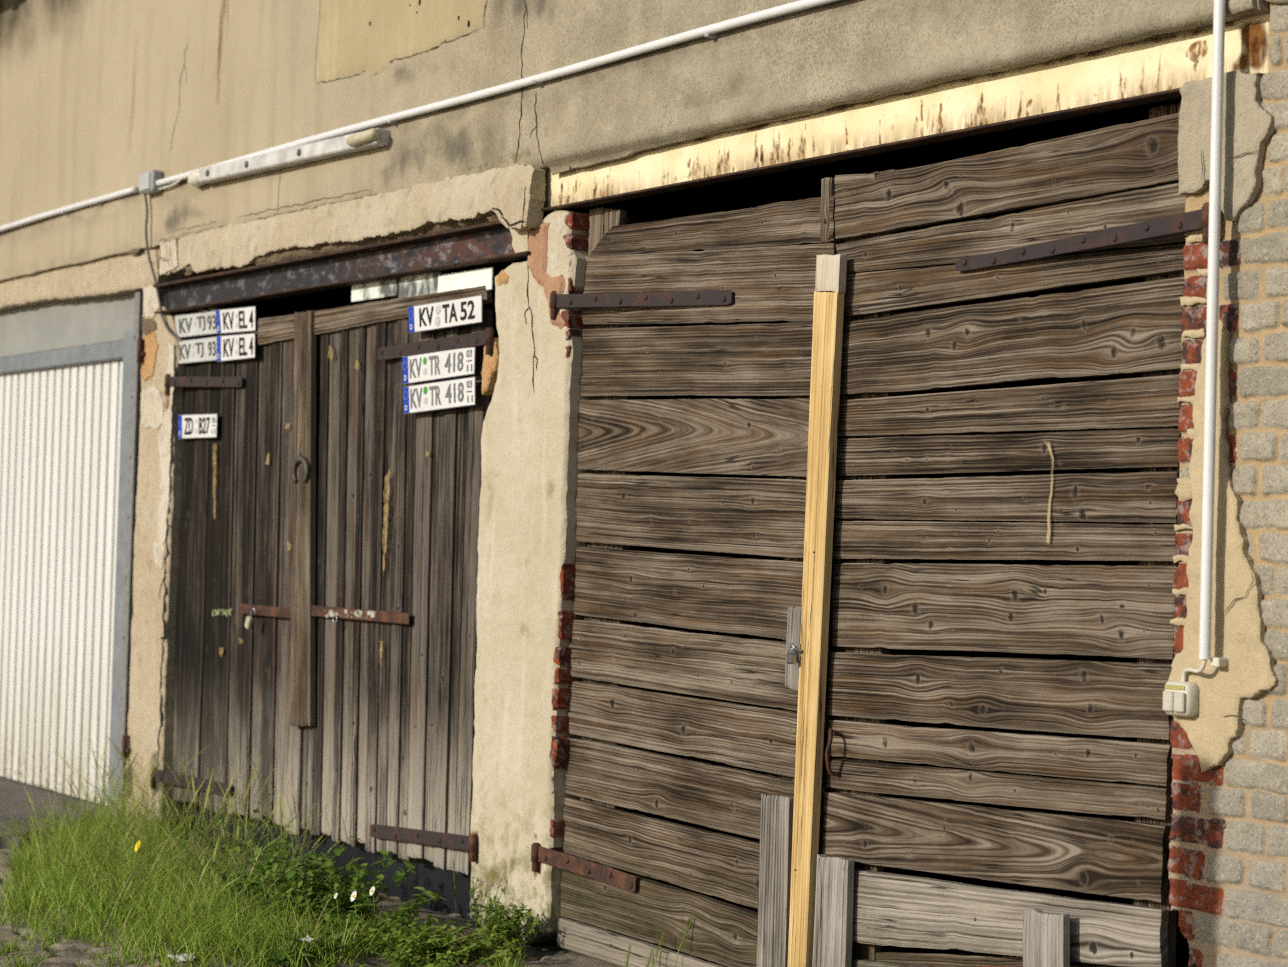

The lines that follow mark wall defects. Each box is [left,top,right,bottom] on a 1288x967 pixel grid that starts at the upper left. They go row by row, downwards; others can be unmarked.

crack [516,1,551,173]
flaking render [1178,71,1275,222]
flaking render [563,212,589,251]
flaking render [1184,228,1202,243]
flaking render [568,277,583,294]
flaking render [1180,296,1207,308]
crack [524,265,538,390]
flaking render [561,310,588,358]
flaking render [1168,319,1279,772]
flaking render [549,564,580,769]
flaking render [549,820,571,855]